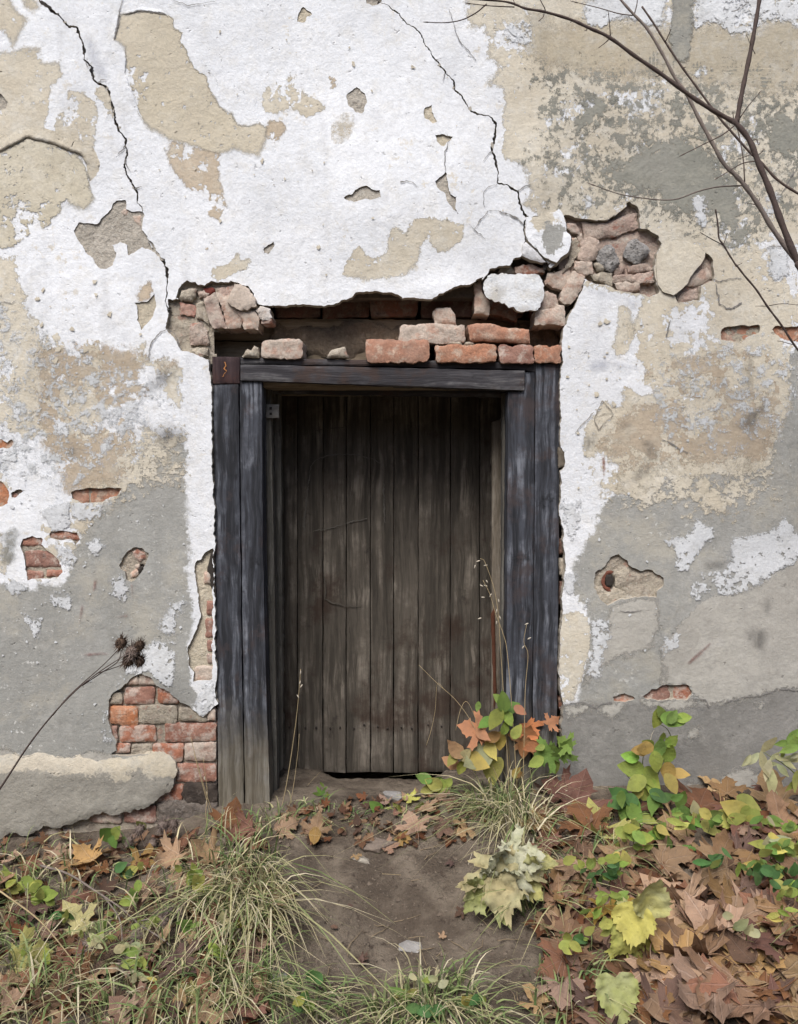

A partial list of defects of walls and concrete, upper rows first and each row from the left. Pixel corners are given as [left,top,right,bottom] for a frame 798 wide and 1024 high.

crack [114,1,214,39]
crack [40,0,142,207]
flaking render [110,7,325,223]
crack [377,1,529,242]
peeling [0,0,187,584]
crack [148,259,180,357]
flaking render [168,253,276,364]
peeling [342,173,464,281]
peeling [465,0,798,499]
flaking render [188,549,217,681]
spalling [594,554,663,609]
flaking render [5,674,219,837]